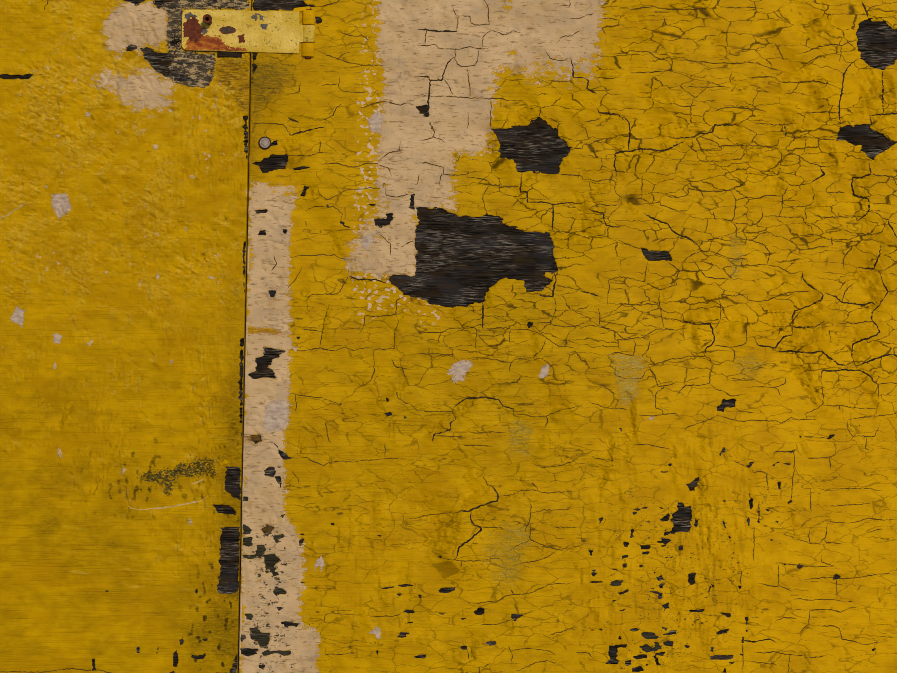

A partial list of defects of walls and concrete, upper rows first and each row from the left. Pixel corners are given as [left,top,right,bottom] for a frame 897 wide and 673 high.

peeling [90,0,322,118]
rust [183,16,249,112]
peeling [856,18,897,70]
peeling [340,0,608,308]
peeling [836,125,897,160]
crack [254,0,897,673]
peeling [209,116,321,673]
peeling [590,502,698,611]
crack [1,665,111,673]
peeling [170,637,184,673]
peeling [710,647,743,673]